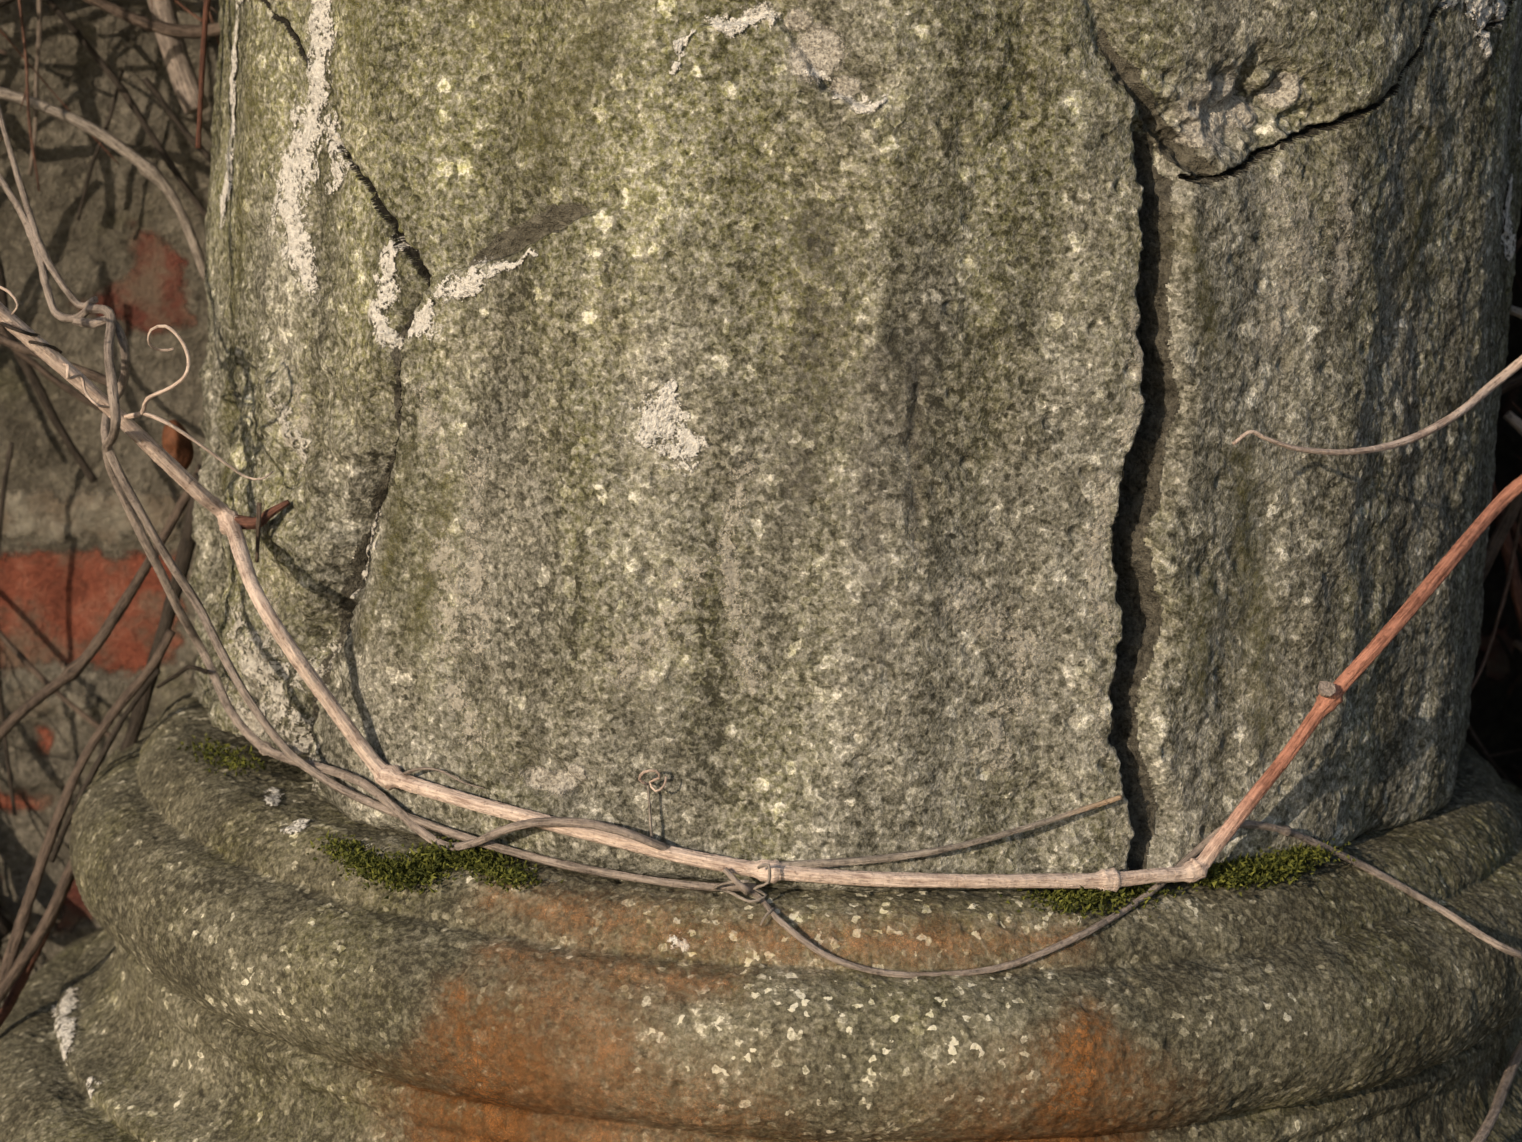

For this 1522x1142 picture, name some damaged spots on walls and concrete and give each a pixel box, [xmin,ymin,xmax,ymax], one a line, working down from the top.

crack [260,0,310,66]
crack [1479,0,1517,37]
crack [469,203,592,266]
crack [303,142,432,754]
crack [1097,3,1448,871]
corrosion [1026,1010,1124,1142]